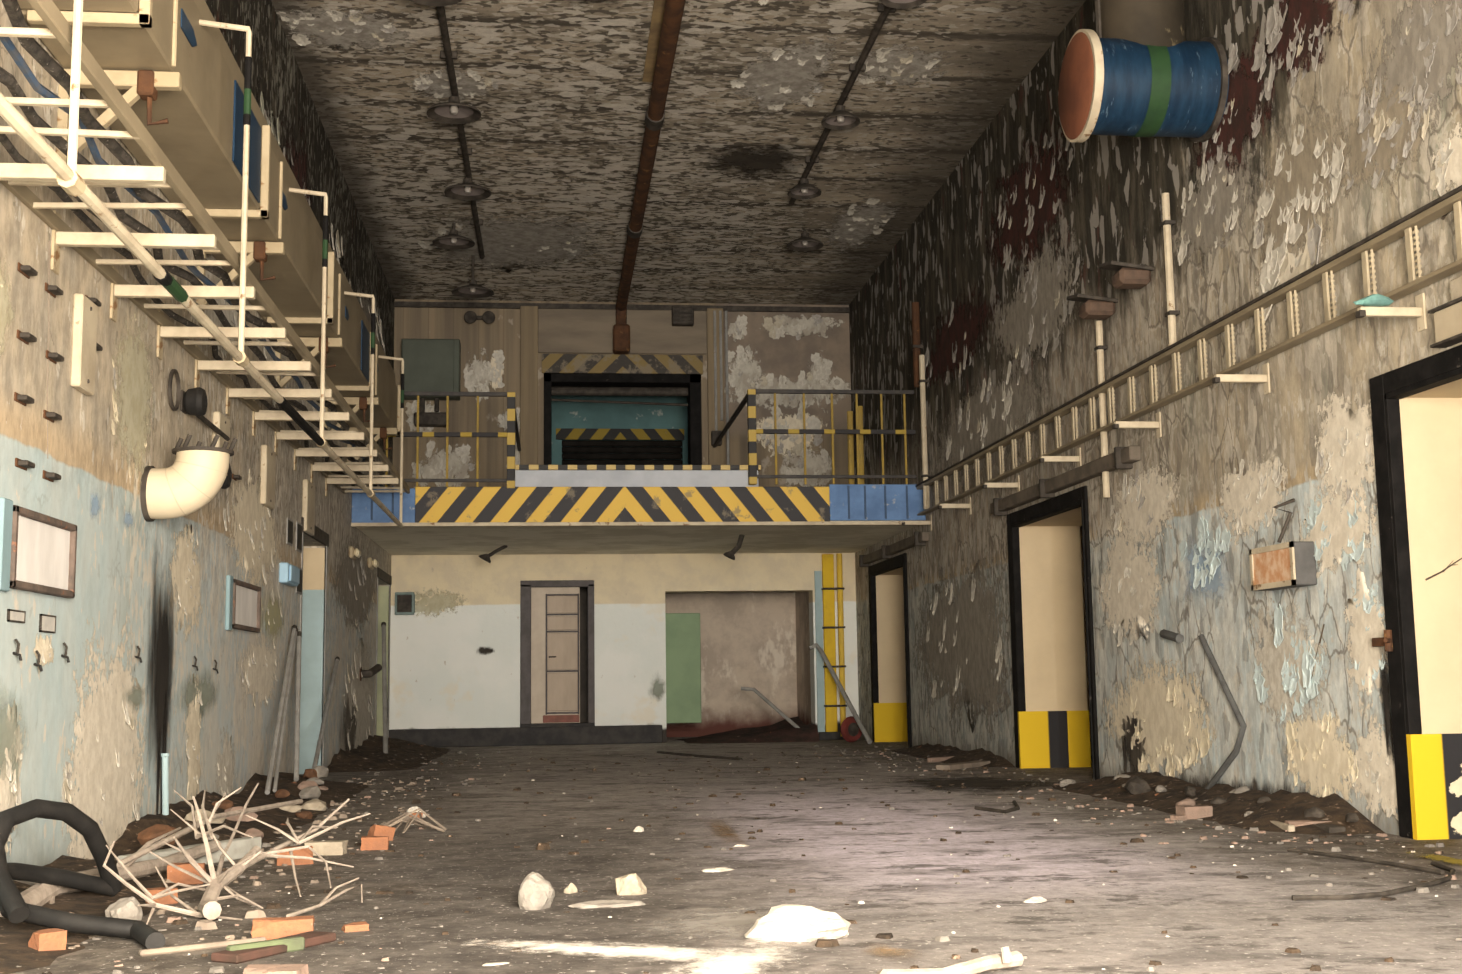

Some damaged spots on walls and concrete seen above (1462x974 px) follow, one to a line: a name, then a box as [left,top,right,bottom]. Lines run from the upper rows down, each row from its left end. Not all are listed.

water stain [711,143,802,176]
peeling [463,348,505,404]
peeling [497,407,520,467]
peeling [724,314,851,487]
peeling [1096,454,1288,777]
peeling [1248,382,1398,824]
peeling [61,616,148,848]
peeling [61,825,94,859]